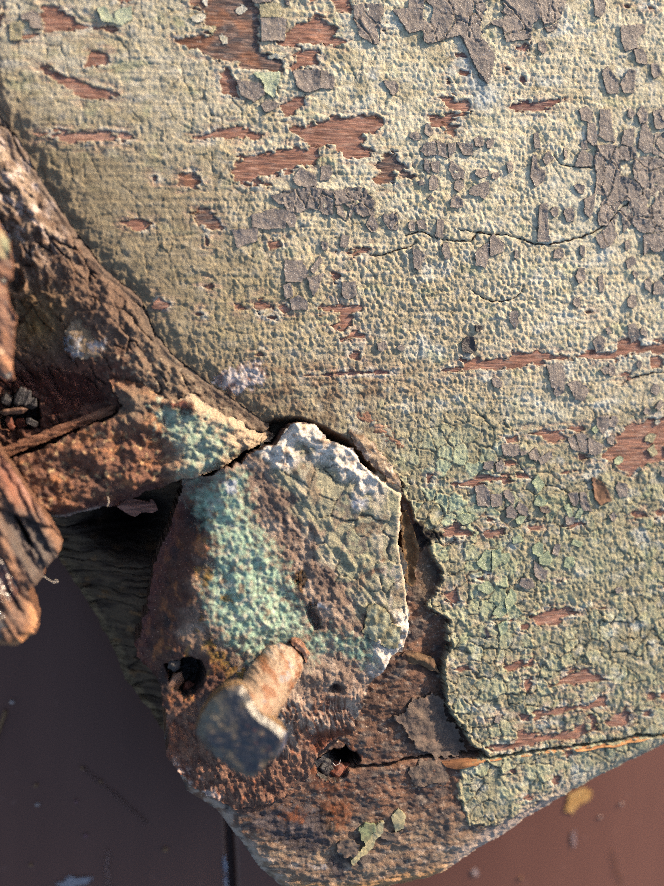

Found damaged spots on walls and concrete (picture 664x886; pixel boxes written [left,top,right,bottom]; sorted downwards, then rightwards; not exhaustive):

peeling [0,0,133,41]
peeling [40,65,119,101]
peeling [174,0,513,259]
peeling [331,0,566,84]
peeling [509,98,566,113]
crack [378,193,643,256]
peeling [529,105,664,295]
peeling [441,323,664,401]
rust [0,367,275,518]
peeling [441,384,664,636]
peeling [393,691,467,787]
peeling [485,692,664,758]